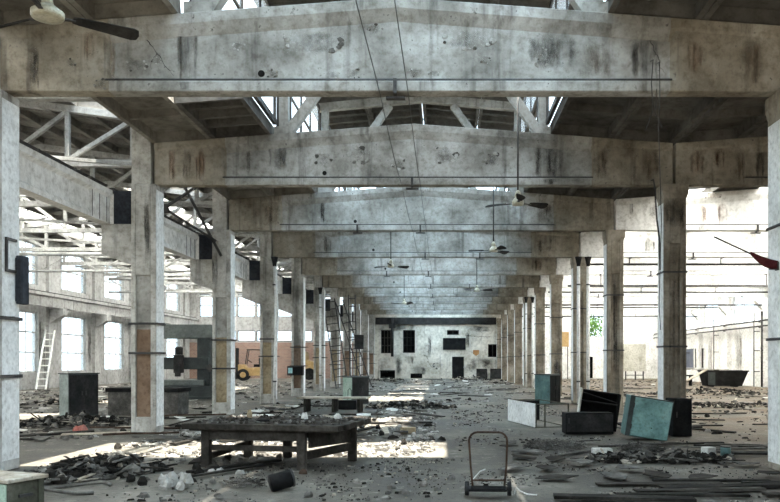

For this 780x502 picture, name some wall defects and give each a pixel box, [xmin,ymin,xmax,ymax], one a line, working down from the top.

peeling [328,37,344,53]